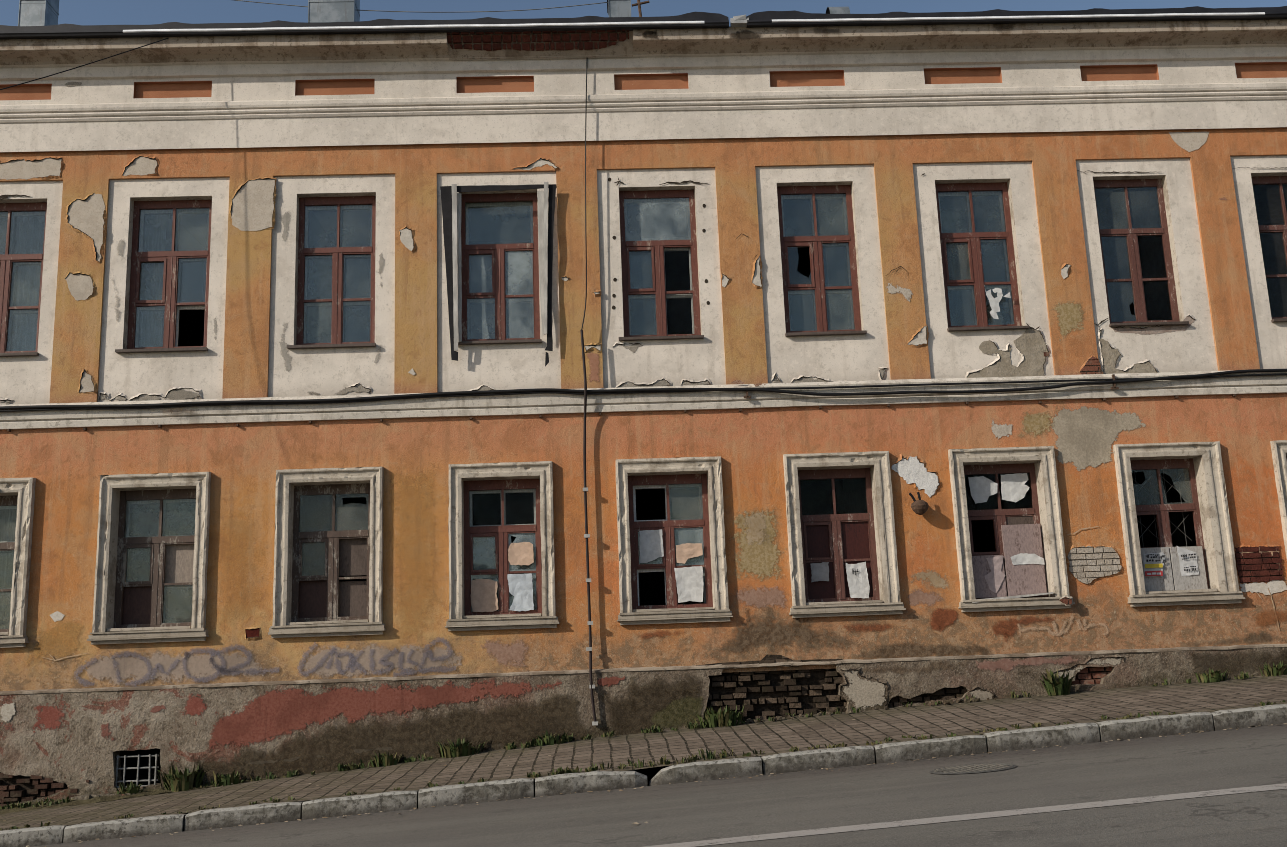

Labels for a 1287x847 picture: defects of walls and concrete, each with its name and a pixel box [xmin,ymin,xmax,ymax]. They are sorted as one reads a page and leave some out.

flaking render [447,29,629,51]
peeling [0,156,64,180]
peeling [229,177,290,241]
peeling [64,193,124,301]
peeling [965,301,1196,378]
peeling [990,406,1146,471]
peeling [891,454,941,496]
flaking render [1066,544,1122,584]
flaking render [1234,544,1287,595]
spalling [696,654,995,722]
water stain [193,694,587,780]
spalling [0,772,90,807]